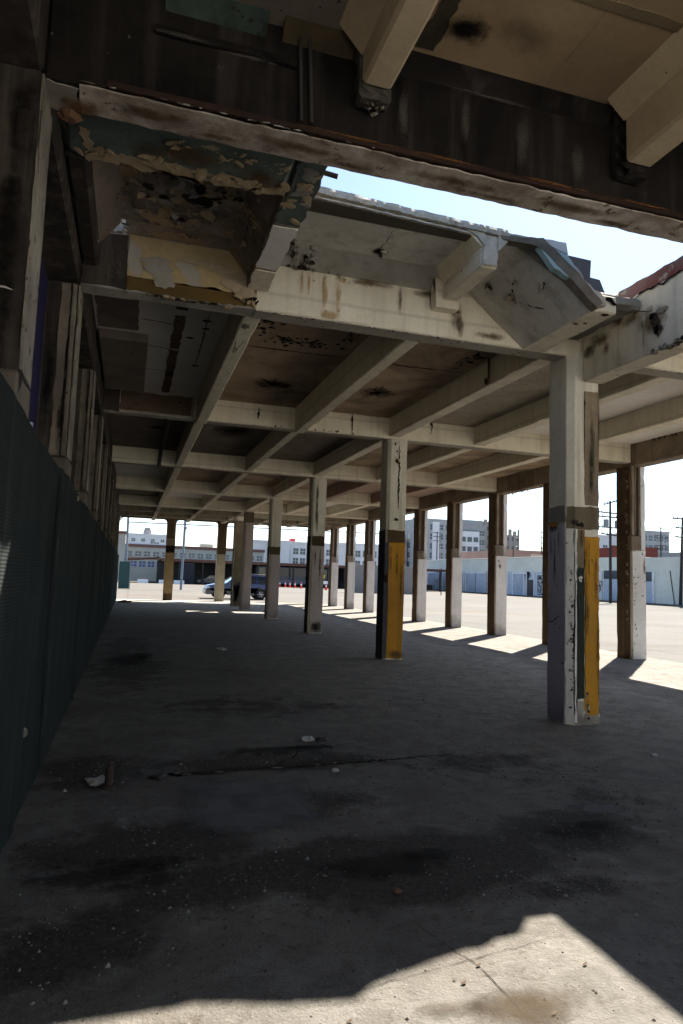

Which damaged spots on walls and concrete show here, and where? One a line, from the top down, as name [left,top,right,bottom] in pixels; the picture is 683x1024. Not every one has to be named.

peeling [73,126,320,226]
peeling [141,256,259,309]
spalling [286,239,341,278]
spalling [625,305,683,355]
crack [167,752,453,777]